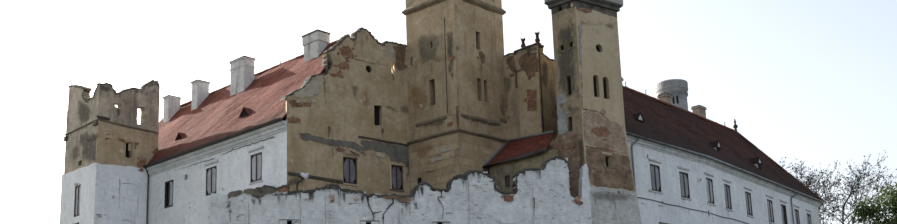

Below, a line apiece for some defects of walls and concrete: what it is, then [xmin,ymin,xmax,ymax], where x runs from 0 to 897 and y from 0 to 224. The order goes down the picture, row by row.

flaking render [228,24,634,206]